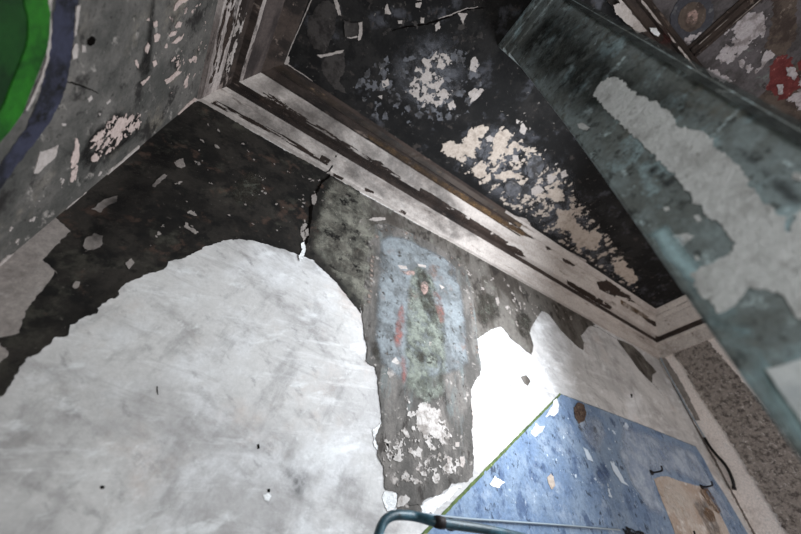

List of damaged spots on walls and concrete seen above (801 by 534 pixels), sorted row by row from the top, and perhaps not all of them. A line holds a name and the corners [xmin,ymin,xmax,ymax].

peeling [145,0,202,88]
peeling [613,0,775,82]
peeling [777,67,801,111]
peeling [0,92,595,396]
peeling [440,113,638,309]
peeling [593,77,801,319]
spalling [382,485,461,514]
spalling [490,476,505,488]
spalling [531,398,559,437]
flaking render [579,420,730,534]
spalling [617,339,801,534]